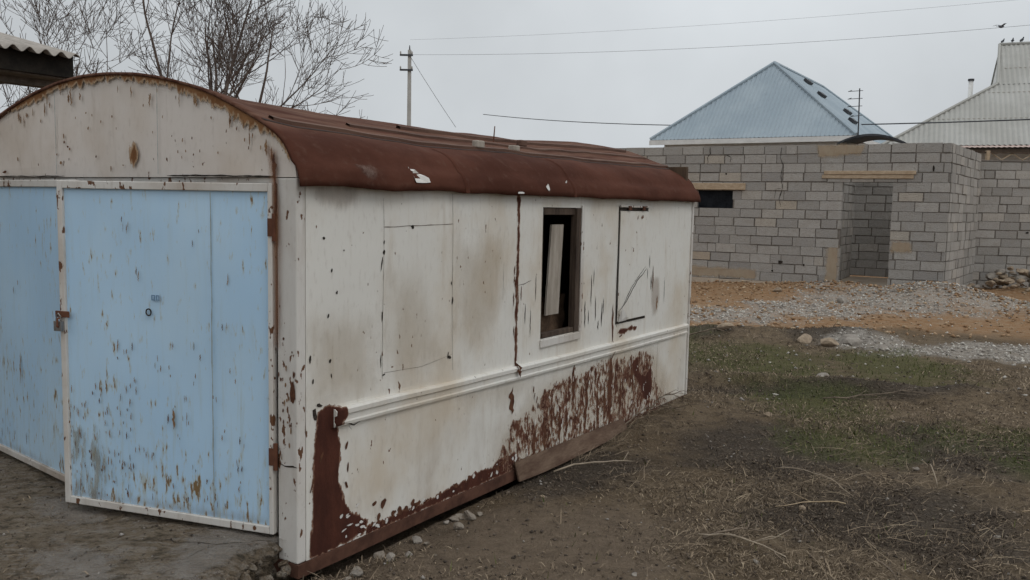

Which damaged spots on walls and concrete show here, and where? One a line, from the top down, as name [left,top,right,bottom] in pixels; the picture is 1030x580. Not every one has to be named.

rust [8,75,290,327]
rust [513,196,522,377]
rust [68,377,154,503]
rust [310,404,427,559]
rust [499,308,666,473]